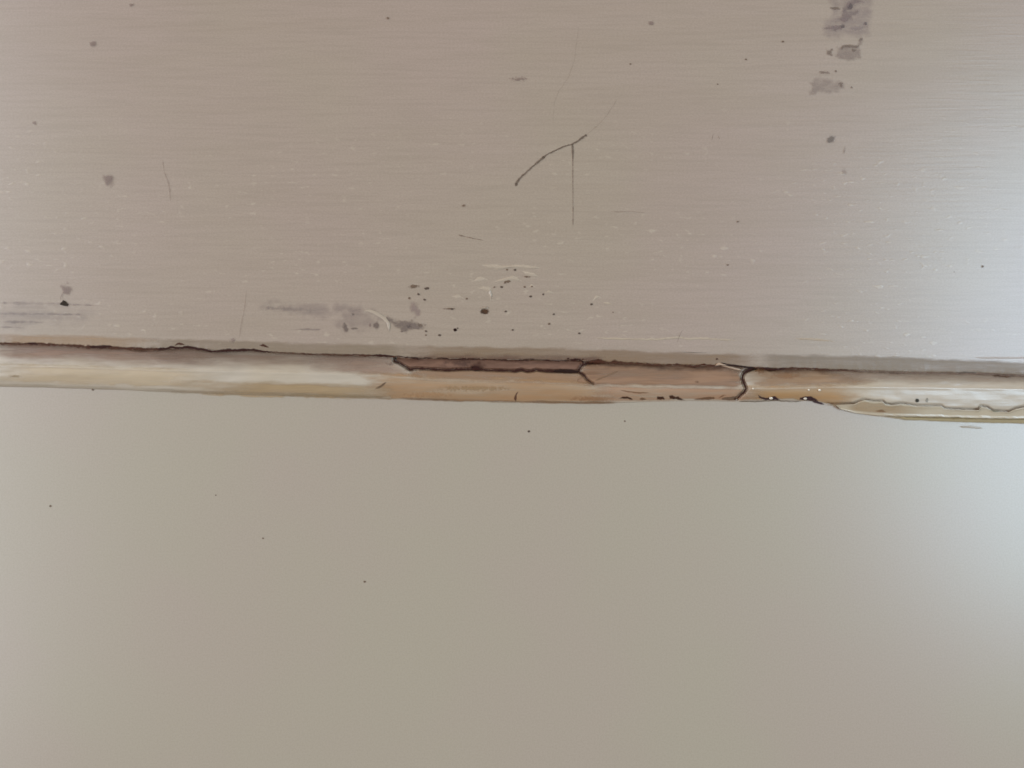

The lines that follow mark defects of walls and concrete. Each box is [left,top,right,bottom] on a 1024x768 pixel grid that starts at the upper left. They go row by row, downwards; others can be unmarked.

crack [0,342,398,357]
spalling [394,356,584,373]
crack [567,358,1024,402]